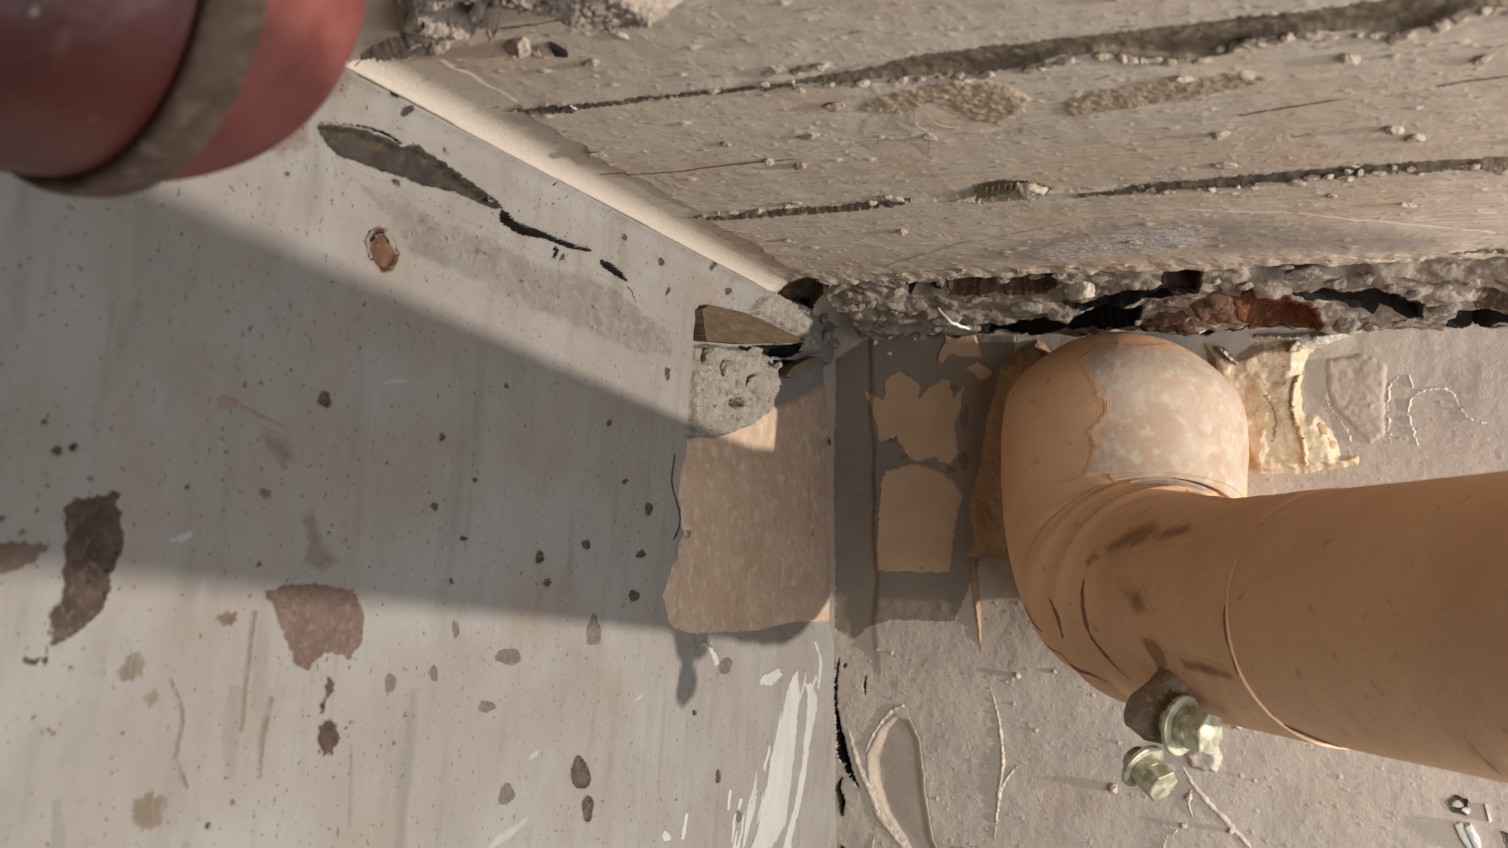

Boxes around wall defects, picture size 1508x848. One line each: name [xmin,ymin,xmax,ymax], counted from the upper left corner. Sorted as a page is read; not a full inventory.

crack [315,121,636,302]
leakage [240,404,297,472]
peeling [863,335,994,573]
leakage [297,507,343,576]
leakage [168,678,190,789]
leakage [221,610,274,781]
leakage [389,687,418,848]